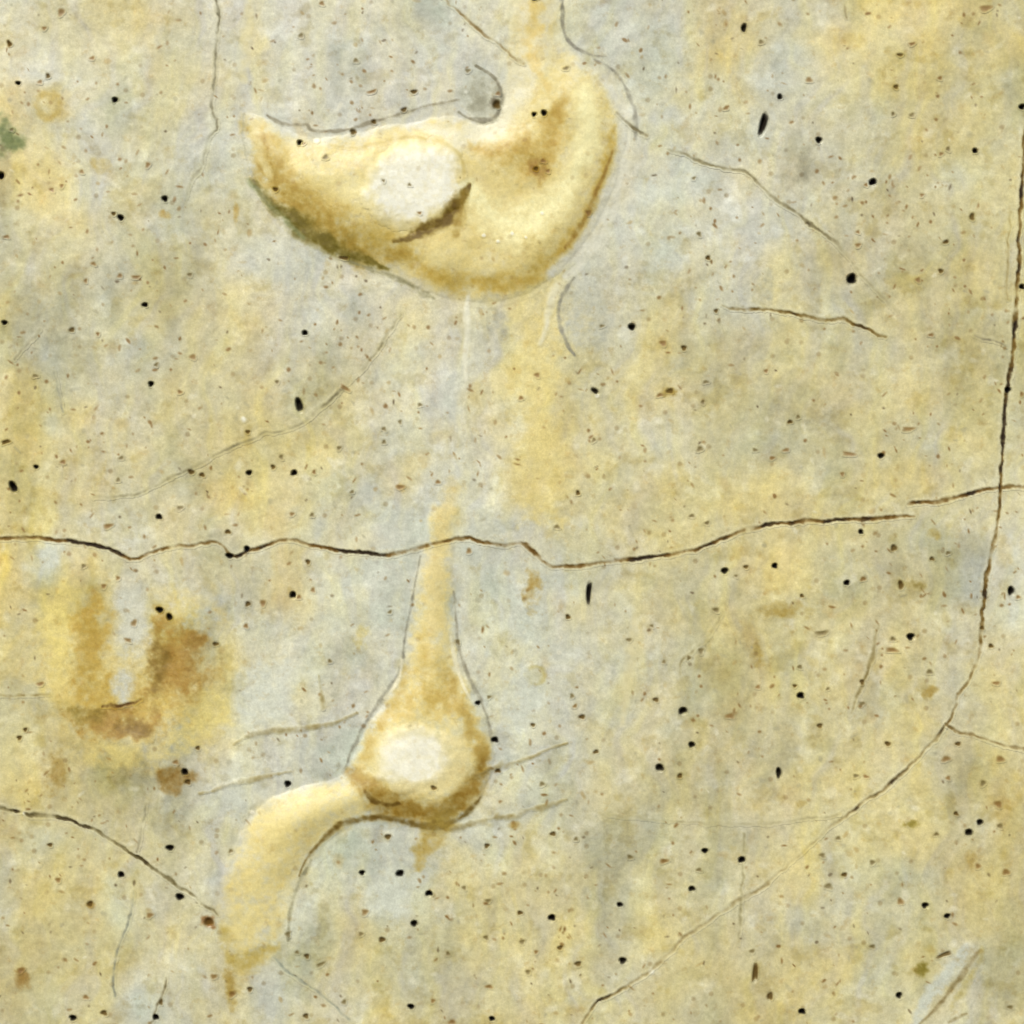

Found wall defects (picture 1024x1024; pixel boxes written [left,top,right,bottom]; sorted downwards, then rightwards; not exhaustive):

crack [443,0,526,66]
crack [0,513,917,570]
crack [579,110,1024,1024]
crack [0,691,51,699]
crack [99,697,144,710]
crack [0,802,221,999]
crack [271,955,356,1024]